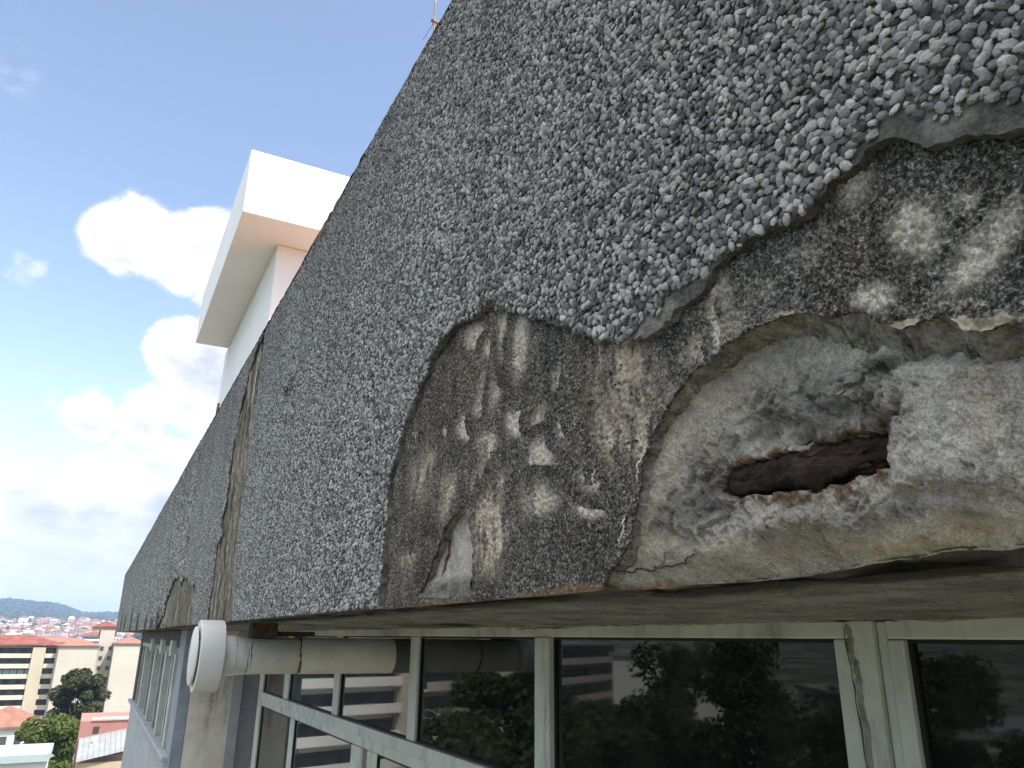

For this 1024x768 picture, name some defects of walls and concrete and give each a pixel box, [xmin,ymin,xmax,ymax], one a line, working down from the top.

efflorescence [886,203,941,260]
efflorescence [947,194,1024,290]
leakage [851,282,919,329]
leakage [946,313,1024,331]
leakage [506,277,749,490]
peeling [379,135,1024,610]
leakage [411,435,456,518]
leakage [443,311,558,574]
efflorescence [577,505,606,519]
rust [709,413,893,507]
peeling [157,579,197,629]
crack [595,552,695,573]